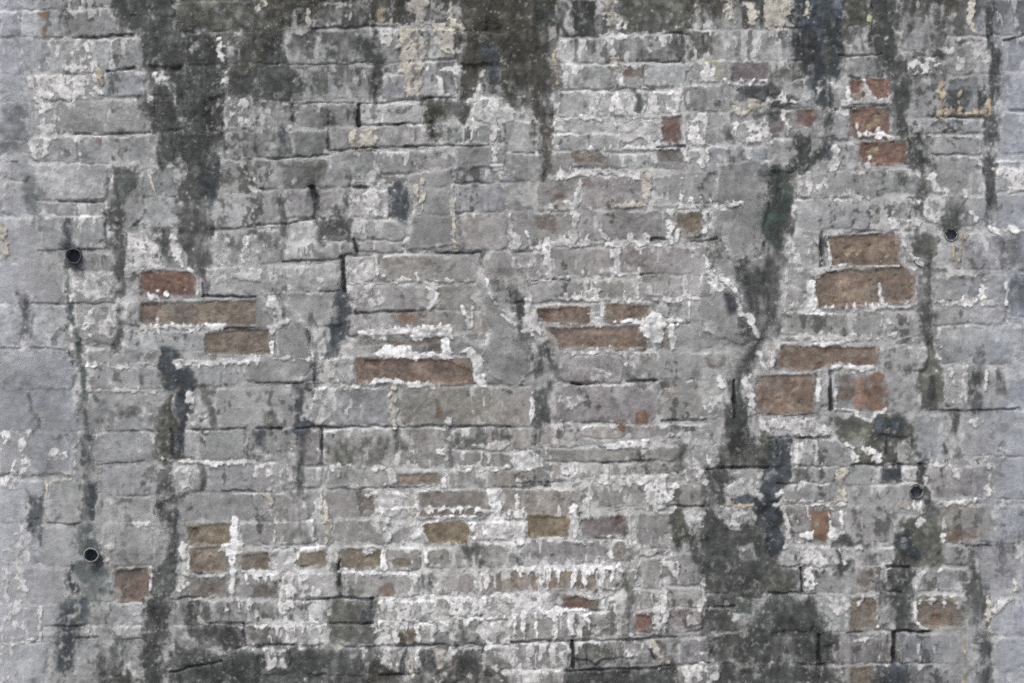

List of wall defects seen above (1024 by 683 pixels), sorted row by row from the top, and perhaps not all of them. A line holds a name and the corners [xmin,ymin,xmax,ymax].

water stain [602,0,1001,202]
spalling [851,77,905,163]
water stain [64,0,470,440]
water stain [357,0,719,372]
water stain [979,155,1024,206]
spalling [817,233,915,308]
peeling [140,271,316,386]
spalling [354,358,474,383]
water stain [79,165,1023,683]
spalling [534,306,648,350]
spalling [754,346,875,416]
spalling [187,523,231,571]